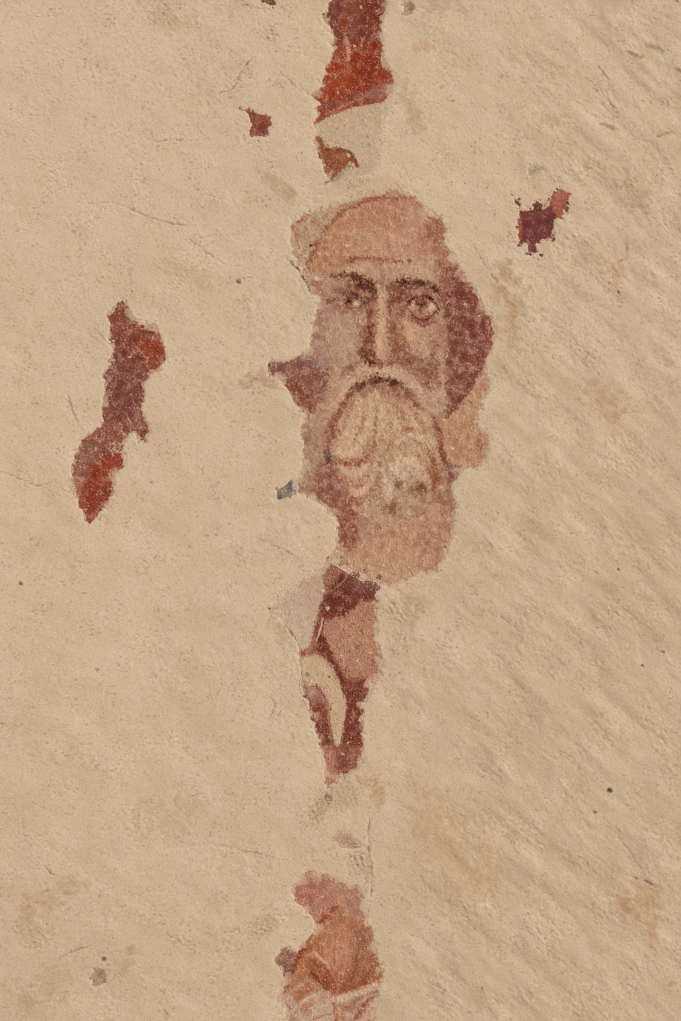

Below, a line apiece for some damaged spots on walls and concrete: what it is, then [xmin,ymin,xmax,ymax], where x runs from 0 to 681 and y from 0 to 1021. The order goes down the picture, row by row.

flaking render [247,0,497,1021]